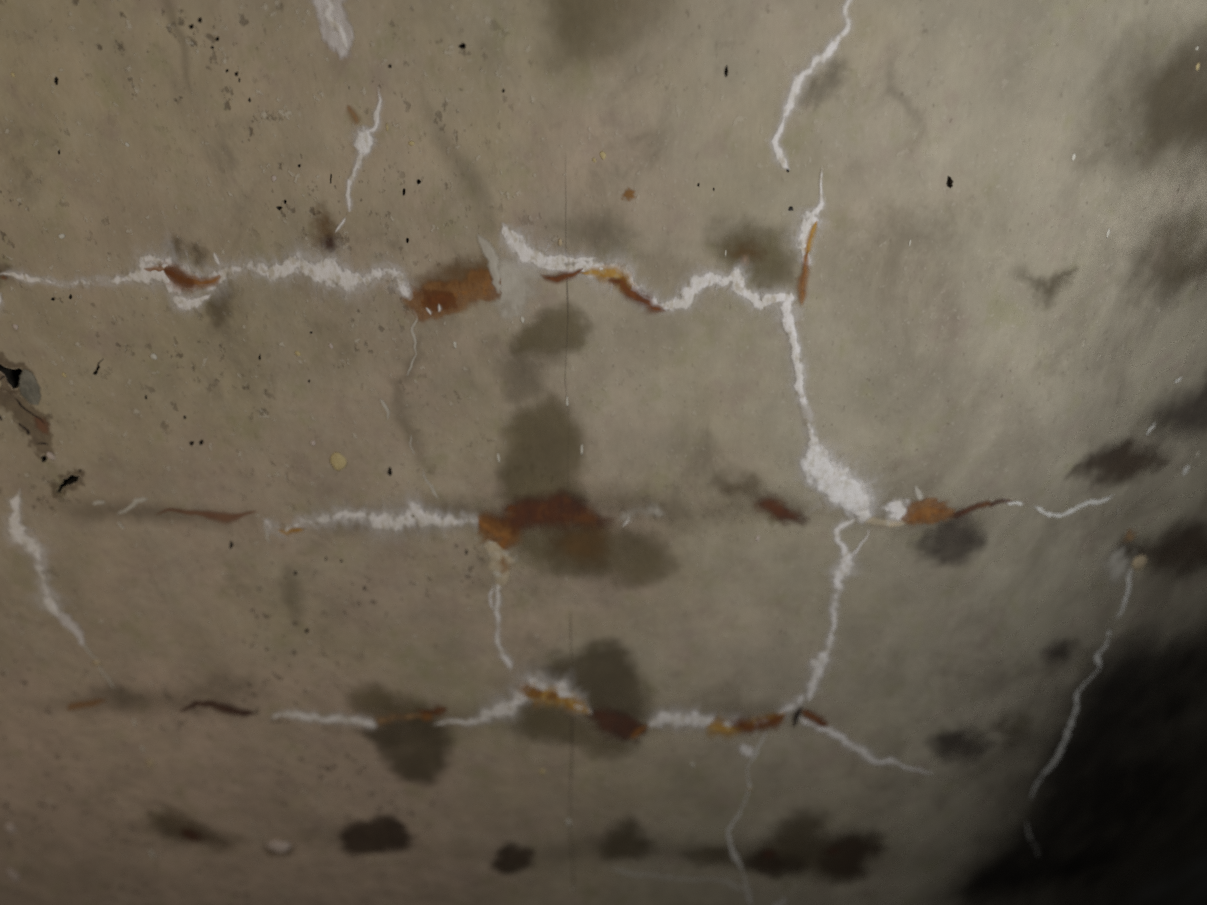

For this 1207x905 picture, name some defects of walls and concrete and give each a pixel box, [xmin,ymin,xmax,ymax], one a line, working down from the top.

crack [771,0,851,168]
leakage [1144,51,1207,153]
crack [0,92,419,375]
corrosion [407,262,500,320]
leakage [478,225,596,318]
spalling [0,364,56,462]
crack [263,436,591,728]
corrosion [475,494,603,557]
corrosion [759,499,800,522]
crack [543,169,1132,905]
leakage [545,644,641,714]
leakage [341,817,410,854]